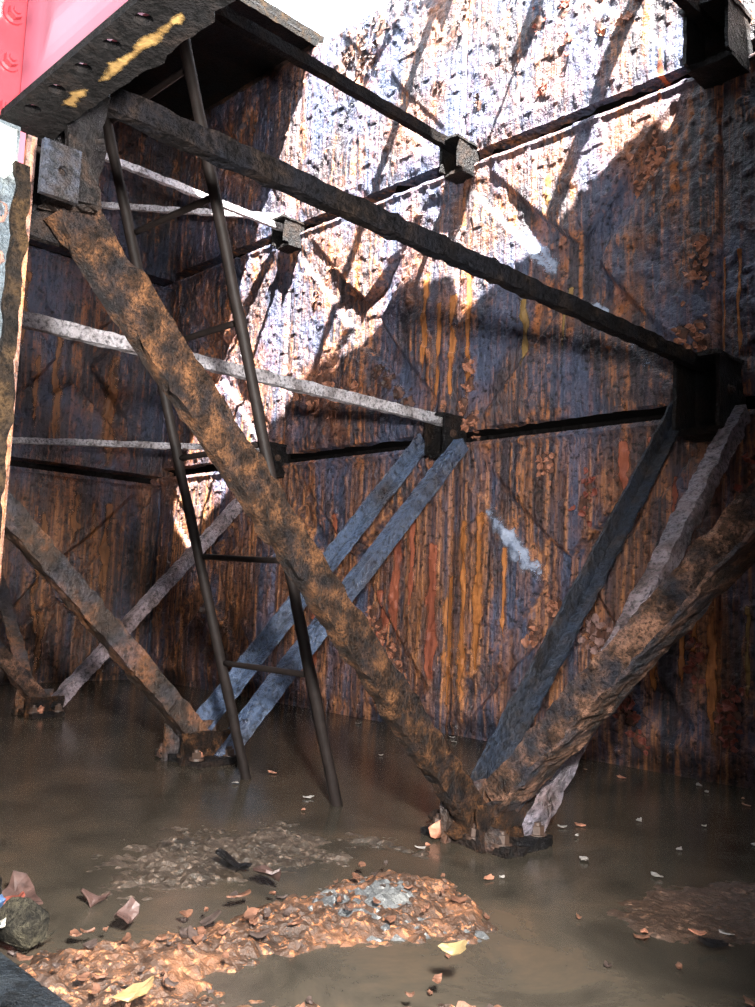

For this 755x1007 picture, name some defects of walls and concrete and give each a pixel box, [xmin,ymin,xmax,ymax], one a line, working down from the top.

peeling [0,123,17,178]
corrosion [626,127,674,199]
corrosion [671,230,743,355]
corrosion [519,299,529,364]
corrosion [32,337,64,439]
corrosion [292,392,351,419]
corrosion [316,370,360,393]
corrosion [618,441,630,490]
leakage [486,511,542,575]
corrosion [424,512,485,706]
corrosion [499,548,507,635]
corrosion [578,613,612,654]